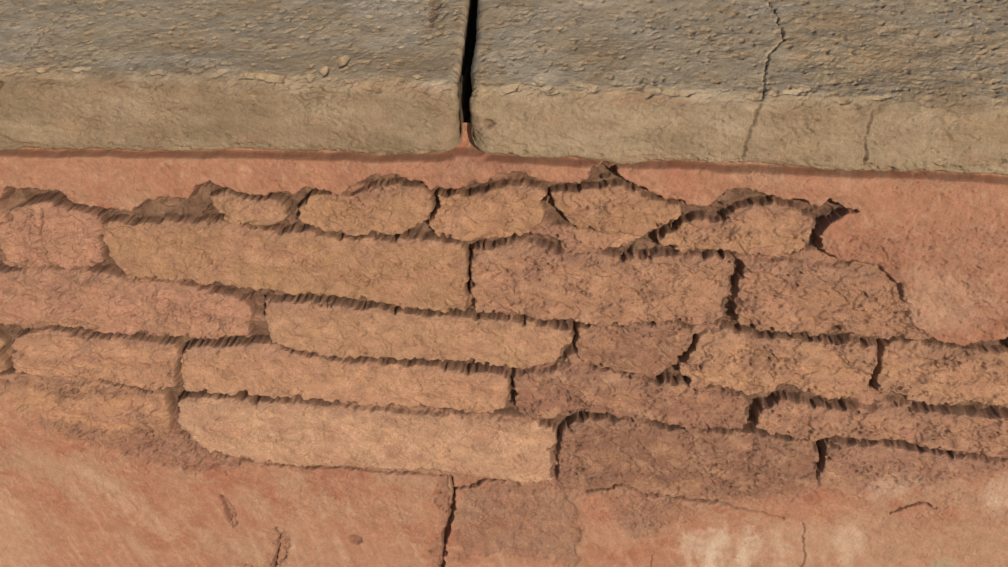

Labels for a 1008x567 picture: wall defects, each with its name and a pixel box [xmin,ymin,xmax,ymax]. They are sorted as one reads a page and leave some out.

crack [766,0,778,15]
crack [740,102,765,161]
crack [861,119,874,168]
spalling [108,182,221,219]
spalling [469,174,601,251]
spalling [616,225,674,254]
spalling [675,188,770,225]
spalling [692,198,857,343]
spalling [65,372,271,476]
spalling [284,319,707,567]
crack [219,493,239,528]
crack [235,457,501,567]